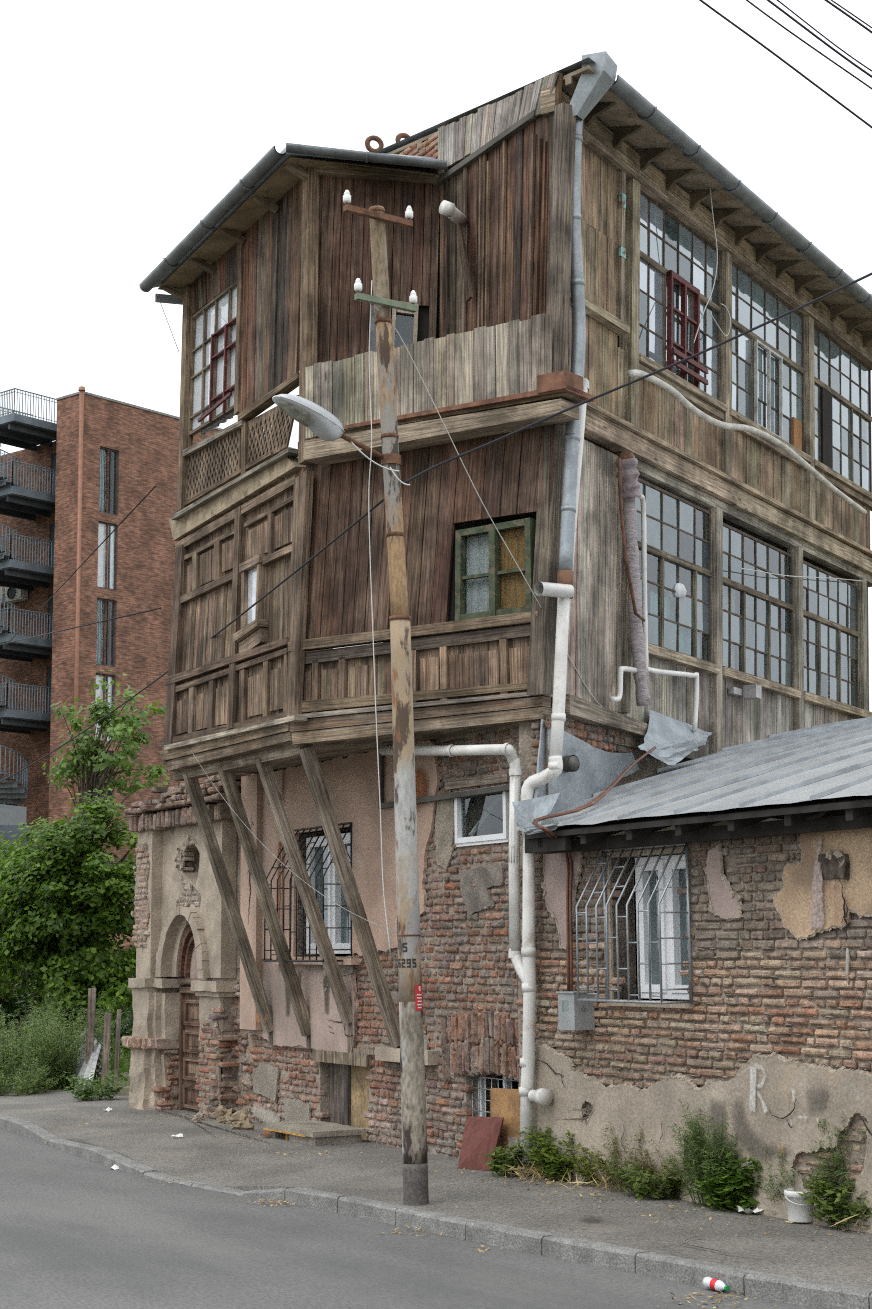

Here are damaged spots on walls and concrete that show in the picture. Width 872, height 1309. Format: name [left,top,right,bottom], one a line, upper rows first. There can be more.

spalling [131,843,150,948]
spalling [174,835,201,907]
peeling [541,851,583,951]
peeling [703,840,743,921]
peeling [772,815,872,941]
spalling [151,1049,179,1111]
spalling [195,964,253,1120]
peeling [524,1044,872,1234]